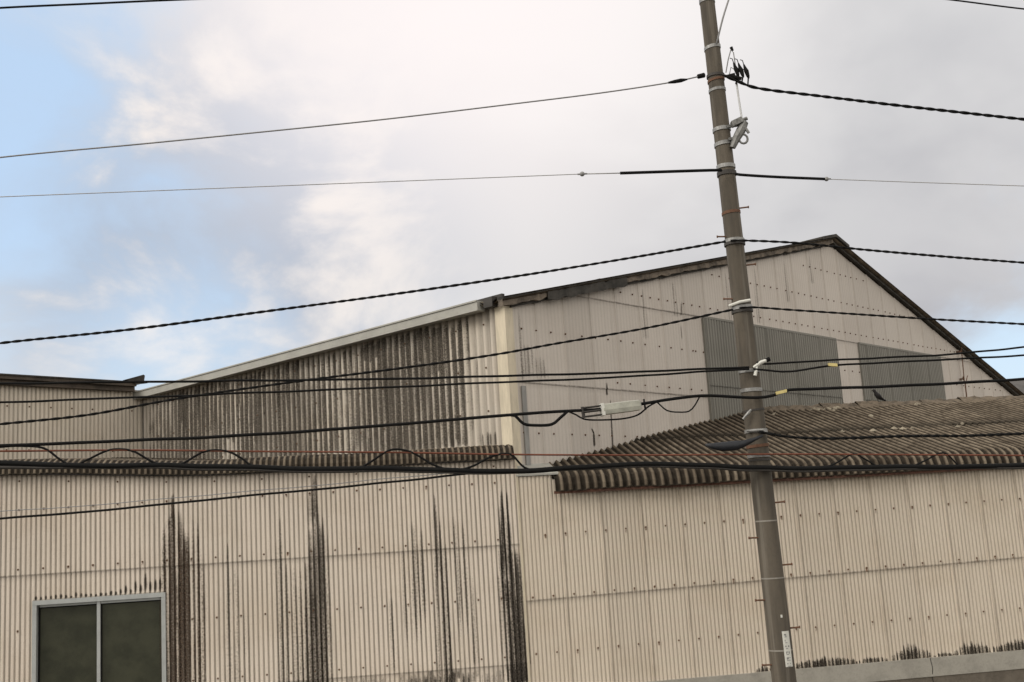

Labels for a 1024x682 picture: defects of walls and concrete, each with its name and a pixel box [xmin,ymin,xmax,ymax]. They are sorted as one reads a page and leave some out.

leakage [150,320,469,459]
leakage [35,496,205,682]
leakage [280,546,289,682]
leakage [301,476,330,682]
leakage [404,499,488,682]
leakage [499,493,531,682]
leakage [796,640,1024,669]